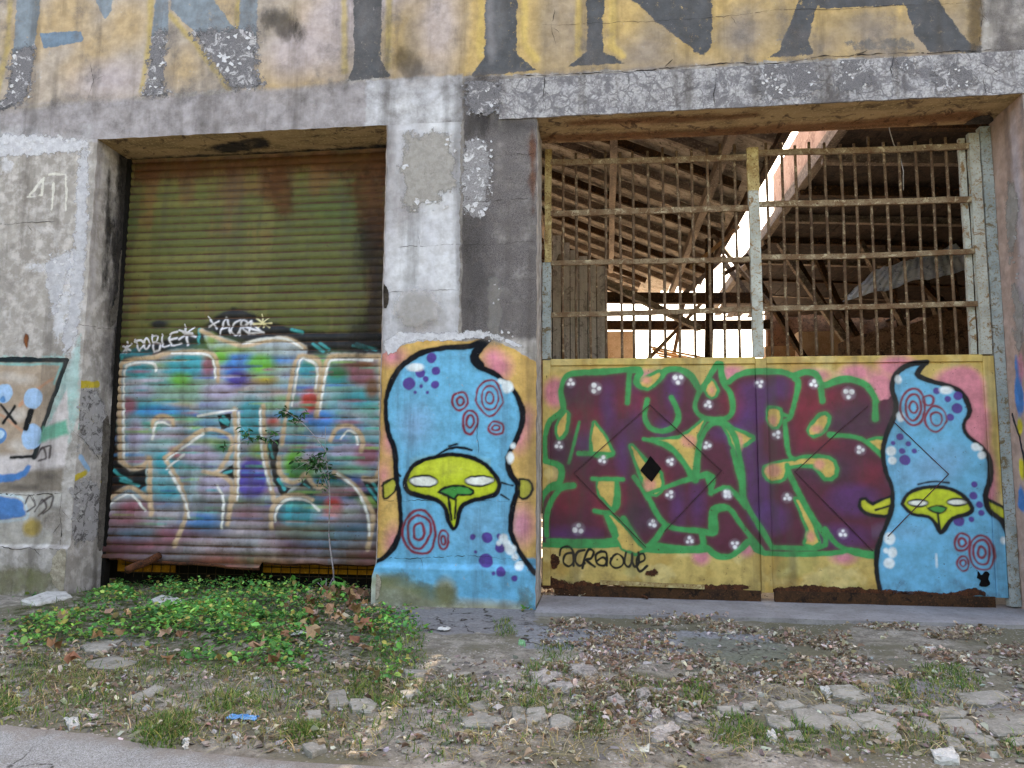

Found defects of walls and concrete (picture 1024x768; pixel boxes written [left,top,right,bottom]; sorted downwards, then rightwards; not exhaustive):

peeling [0,42,37,110]
peeling [140,28,172,99]
peeling [188,22,267,93]
crack [493,1,998,108]
peeling [396,129,494,220]
peeling [0,133,90,354]
leakage [102,138,386,388]
rust [773,584,986,596]